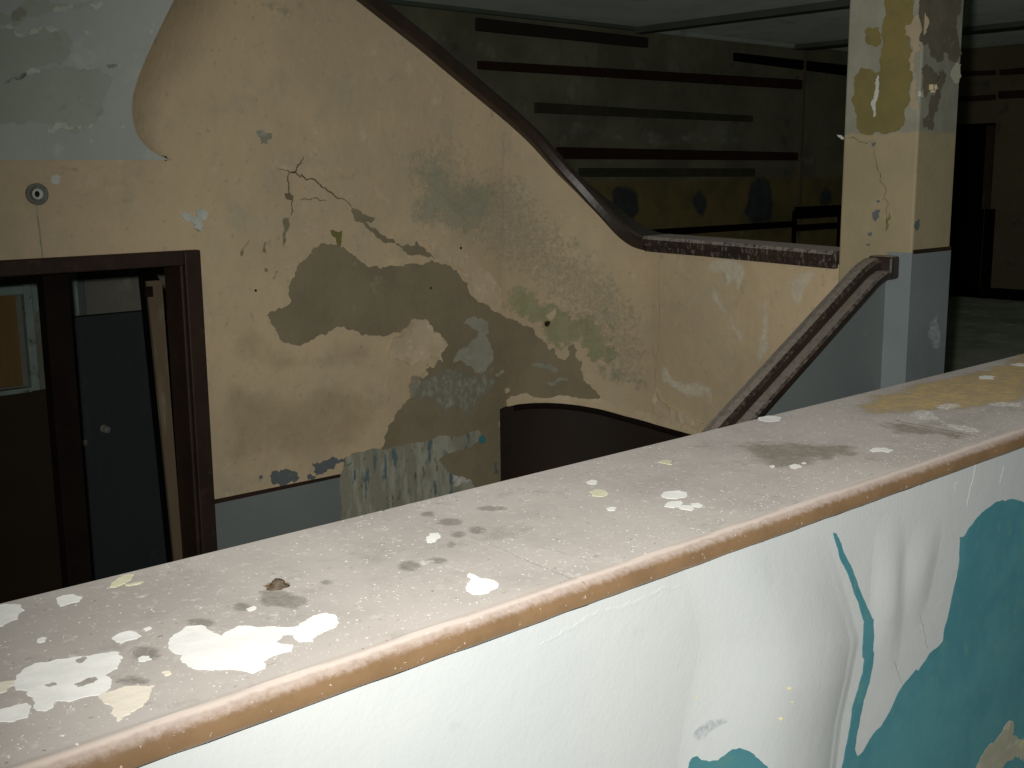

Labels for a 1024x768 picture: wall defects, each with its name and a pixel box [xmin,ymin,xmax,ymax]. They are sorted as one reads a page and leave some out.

peeling [851,0,962,147]
crack [280,157,435,259]
crack [848,136,891,231]
leakage [509,287,614,362]
peeling [259,230,600,520]
leakage [864,355,1024,413]
peeling [661,490,703,511]
peeling [0,604,25,627]
peeling [0,626,155,722]
peeling [110,574,143,588]
peeling [168,613,339,674]
peeling [833,499,1024,768]